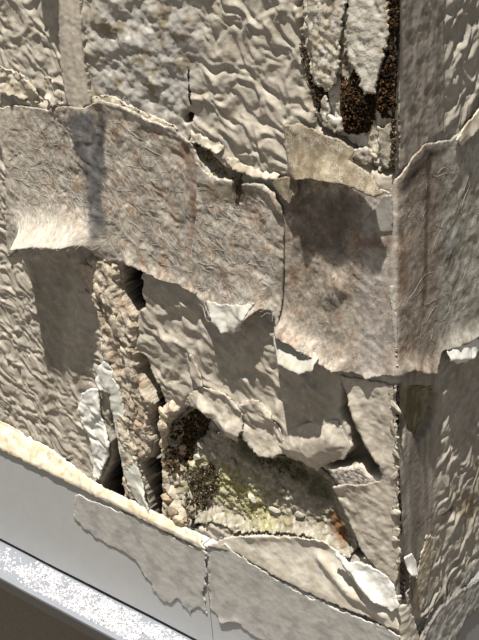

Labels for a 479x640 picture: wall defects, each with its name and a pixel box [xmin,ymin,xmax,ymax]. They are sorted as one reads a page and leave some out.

crack [186,68,194,121]
spalling [301,0,398,172]
spalling [73,255,479,640]
rust [329,512,348,542]